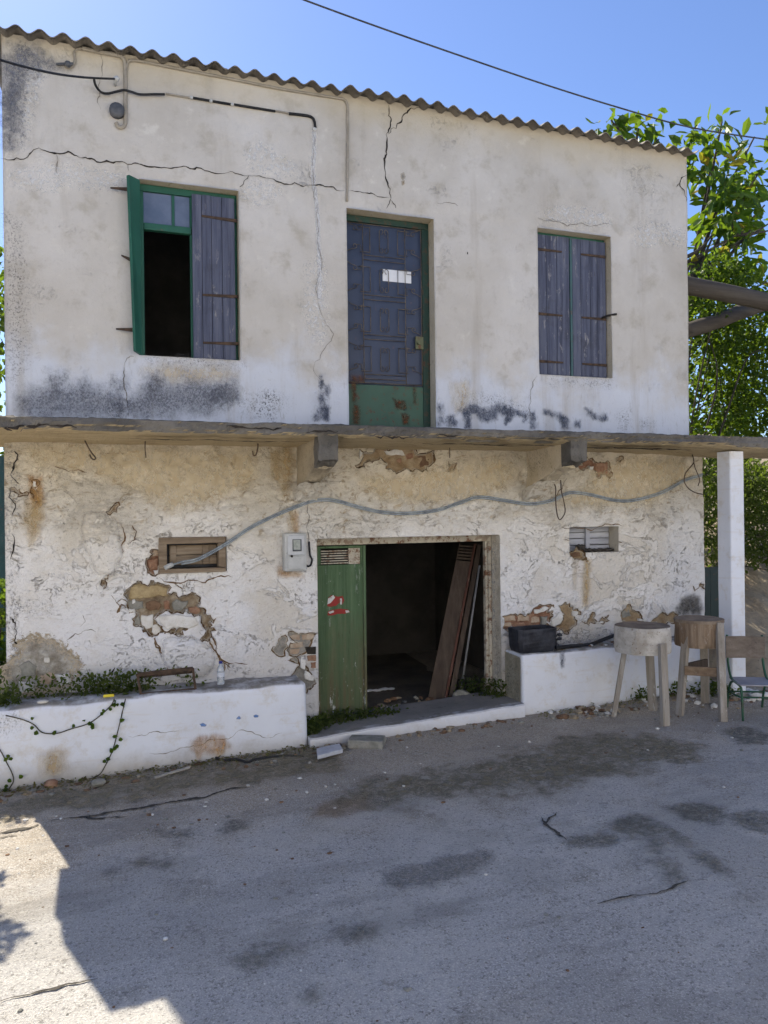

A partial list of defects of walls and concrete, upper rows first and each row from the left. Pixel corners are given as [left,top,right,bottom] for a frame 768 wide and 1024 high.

crack [2,107,420,380]
damp [19,378,230,418]
damp [314,376,329,421]
damp [438,398,579,428]
flaking render [355,449,457,474]
flaking render [578,456,624,479]
flaking render [123,549,216,642]
flaking render [491,535,679,702]
flaking render [271,631,317,693]
crack [0,787,247,838]
crack [597,879,704,904]